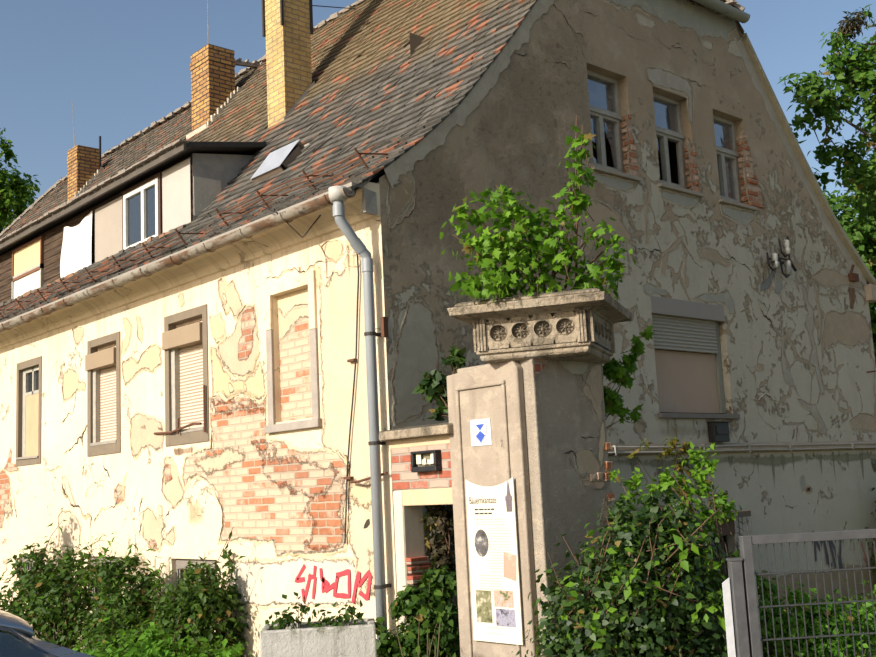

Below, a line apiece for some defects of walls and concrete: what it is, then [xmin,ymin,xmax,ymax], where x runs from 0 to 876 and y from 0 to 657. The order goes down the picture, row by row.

peeling [580,198,632,261]
crack [264,260,322,283]
crack [721,245,774,330]
peeling [62,367,86,403]
peeling [120,315,162,386]
peeling [391,300,441,428]
peeling [823,309,870,350]
flaking render [129,238,375,610]
flaking render [0,447,20,528]
peeling [58,476,81,553]
spalling [406,556,430,590]